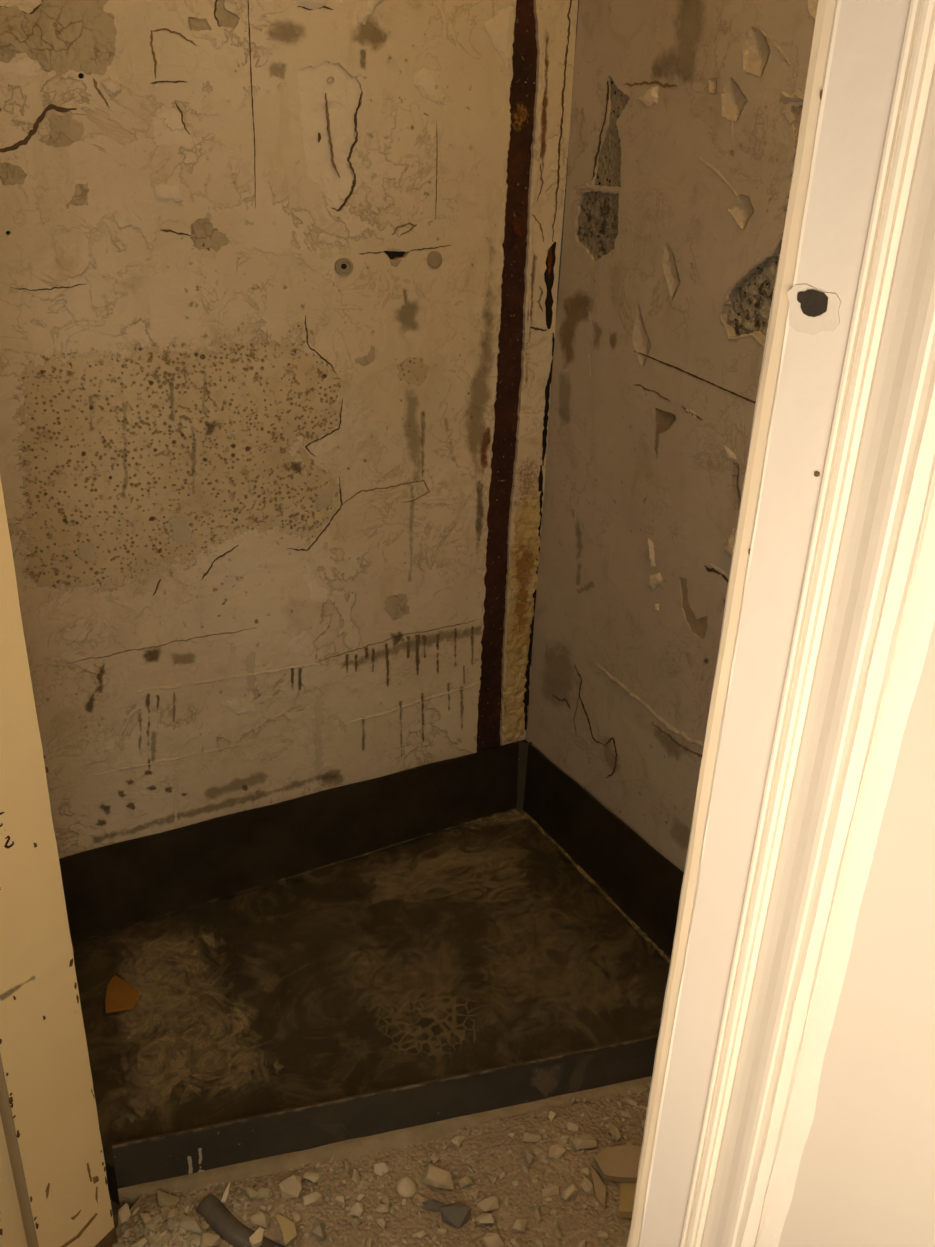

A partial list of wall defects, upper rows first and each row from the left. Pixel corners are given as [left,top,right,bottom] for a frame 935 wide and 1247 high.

peeling [0,0,117,76]
peeling [188,0,239,31]
crack [0,76,122,153]
crack [150,28,207,150]
spalling [577,76,630,300]
spalling [719,198,789,349]
rust [344,0,548,752]
crack [523,0,618,778]
crack [340,480,430,506]
water stain [144,649,159,662]
water stain [139,692,176,747]
water stain [94,760,333,842]